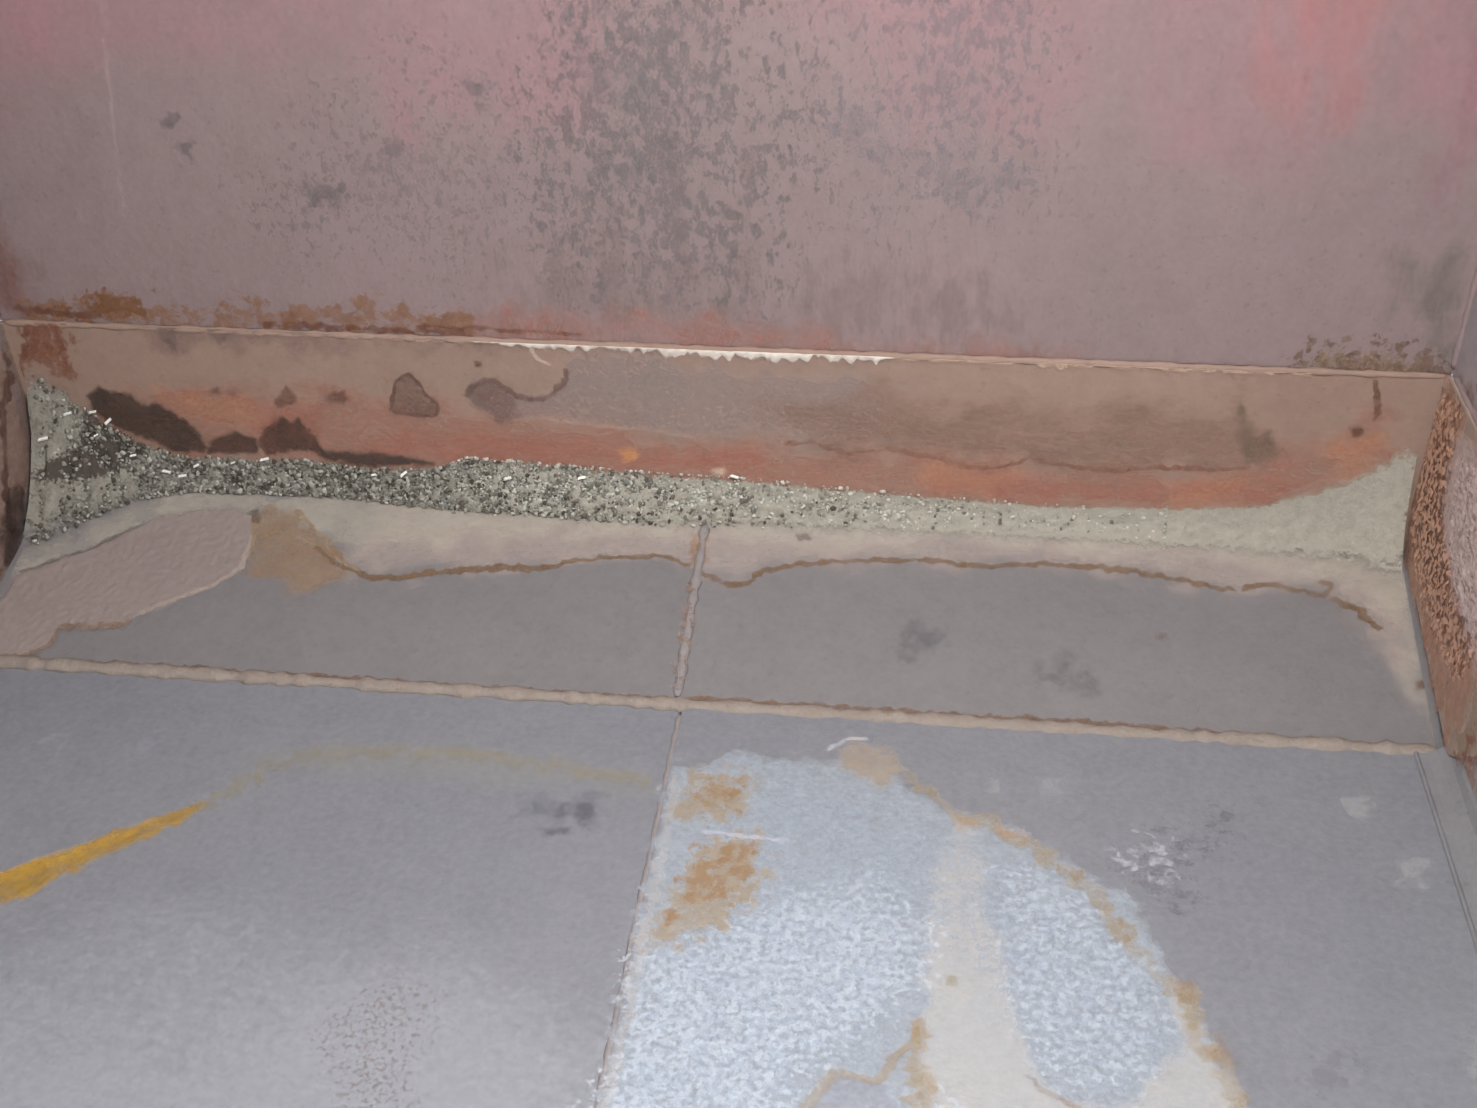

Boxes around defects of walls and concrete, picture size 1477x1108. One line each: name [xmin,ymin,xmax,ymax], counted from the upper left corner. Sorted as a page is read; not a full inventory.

peeling [0,509,251,655]
rust [0,287,580,576]
water stain [23,383,1417,638]
rust [1289,333,1477,682]